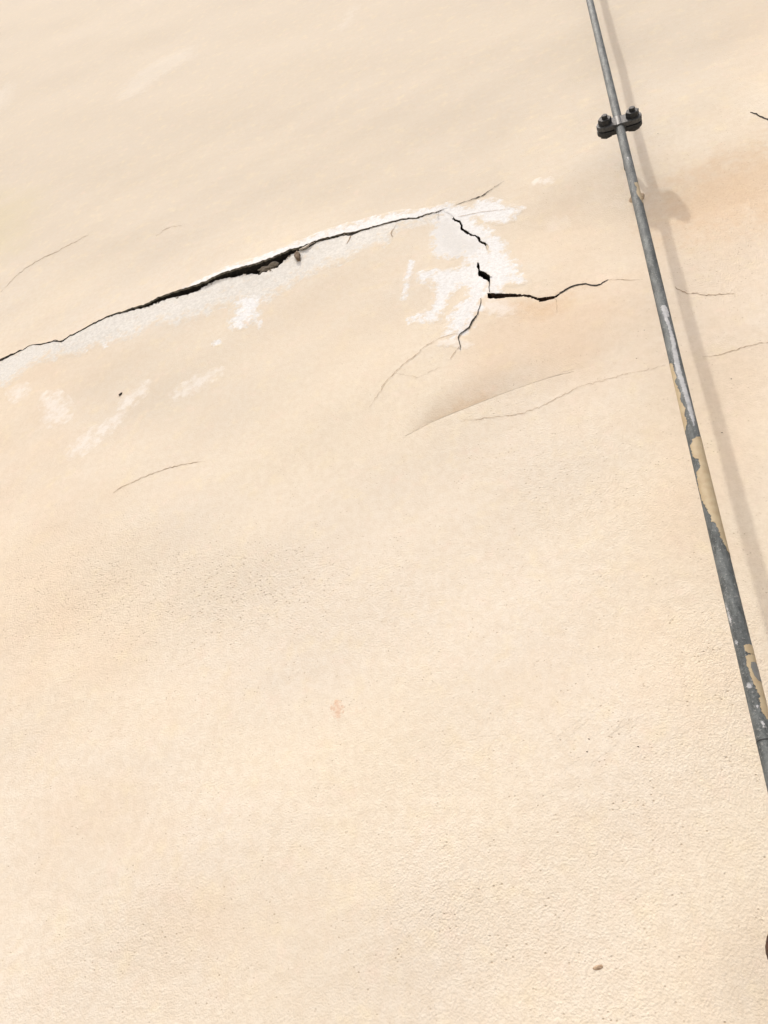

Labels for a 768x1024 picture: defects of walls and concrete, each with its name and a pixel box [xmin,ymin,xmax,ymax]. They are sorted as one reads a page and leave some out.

crack [0,314,115,361]
peeling [0,196,531,391]
crack [251,182,639,407]